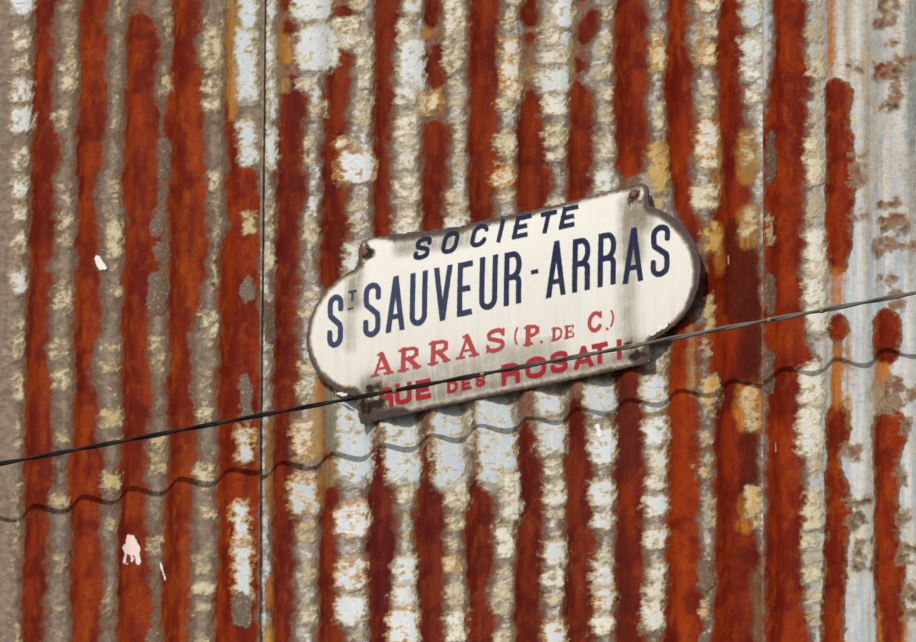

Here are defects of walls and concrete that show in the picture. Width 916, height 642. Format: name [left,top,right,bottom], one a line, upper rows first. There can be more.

peeling [289,0,375,126]
peeling [391,0,466,234]
peeling [534,0,577,161]
peeling [690,83,721,213]
corrosion [15,0,404,642]
corrosion [360,0,916,642]
peeling [285,419,320,542]
peeling [333,393,525,642]
peeling [534,383,568,519]
peeling [582,373,618,534]
peeling [587,547,621,640]
peeling [638,345,671,634]